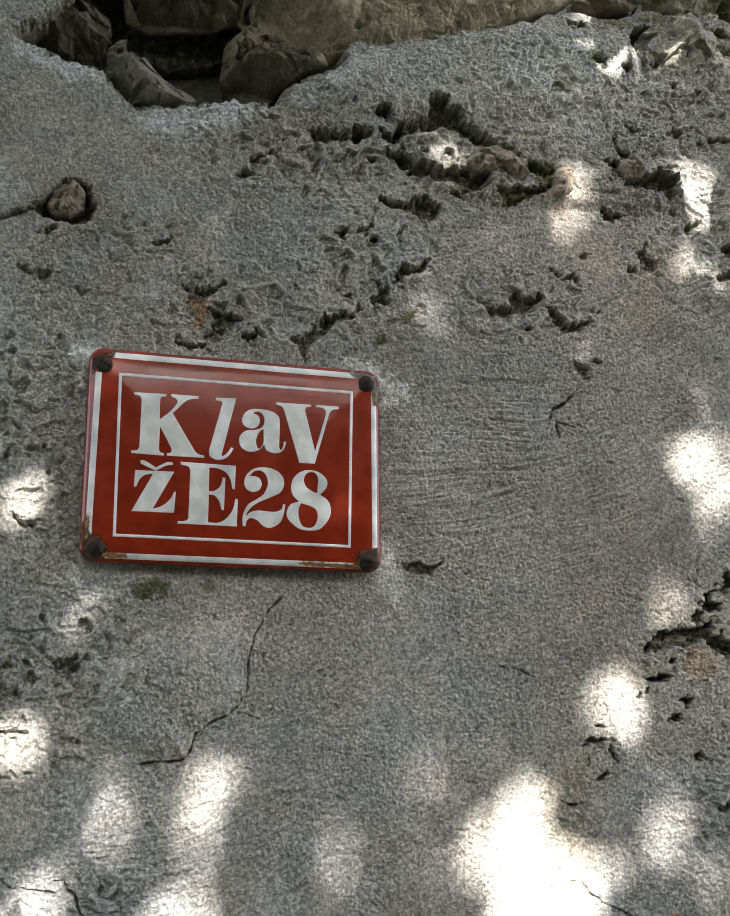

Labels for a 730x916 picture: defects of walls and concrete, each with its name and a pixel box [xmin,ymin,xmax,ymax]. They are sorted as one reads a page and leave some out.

spalling [12,0,352,111]
crack [138,591,285,766]
spalling [667,694,695,725]
spalling [636,570,730,698]
crack [0,878,83,916]
crack [546,879,633,916]